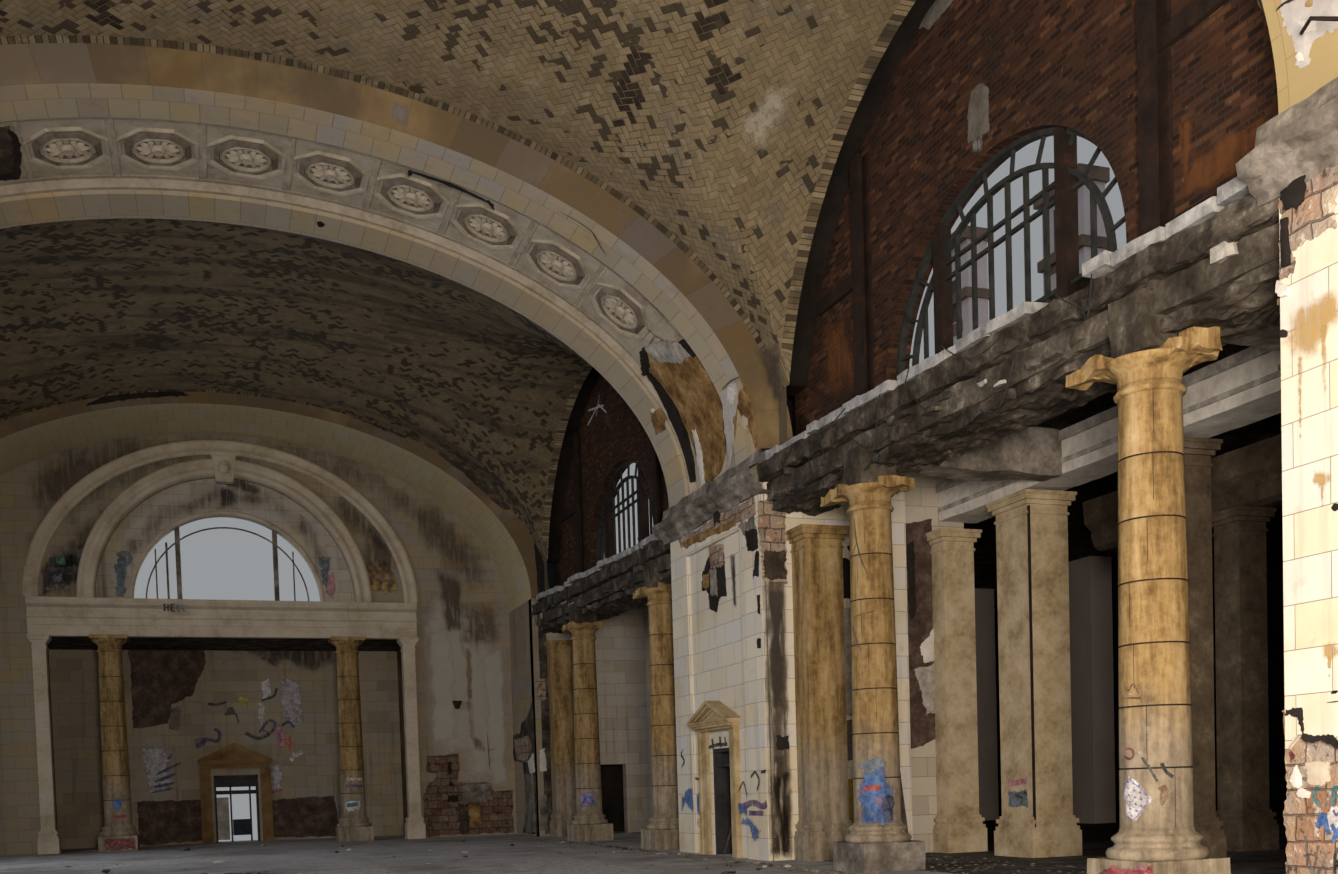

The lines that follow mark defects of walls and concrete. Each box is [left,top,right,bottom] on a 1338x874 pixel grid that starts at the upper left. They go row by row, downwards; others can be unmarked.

spalling [919,0,954,30]
flaking render [1276,0,1338,70]
spalling [0,129,22,181]
spalling [1275,165,1338,297]
spalling [639,339,758,487]
spalling [128,650,206,731]
spalling [423,626,553,837]
spalling [1282,707,1338,874]